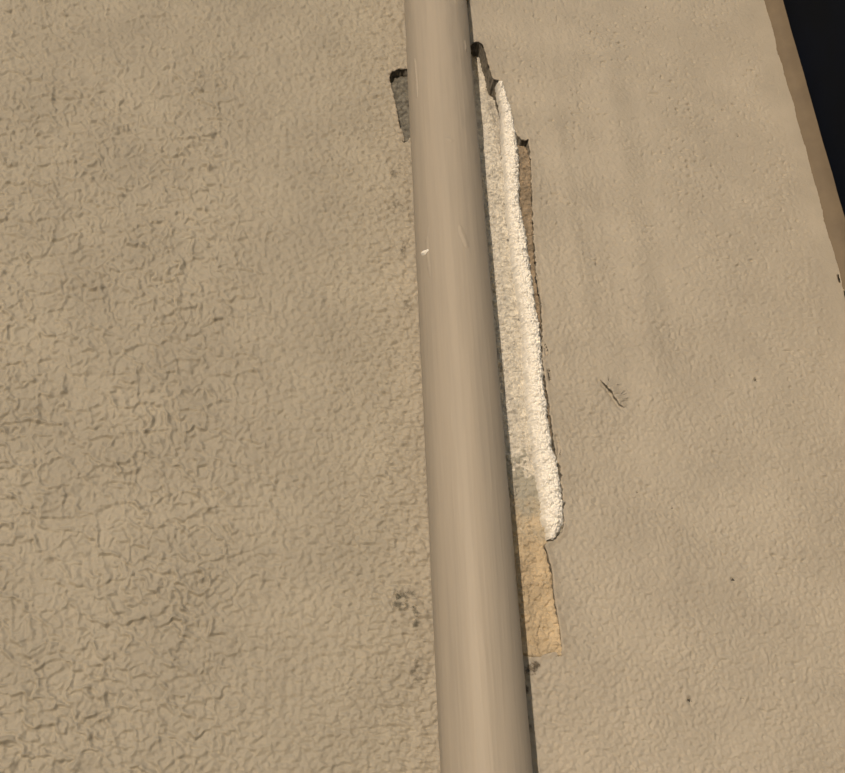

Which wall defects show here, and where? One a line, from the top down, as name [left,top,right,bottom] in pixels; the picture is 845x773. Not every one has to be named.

spalling [384,65,410,143]
spalling [470,39,569,663]